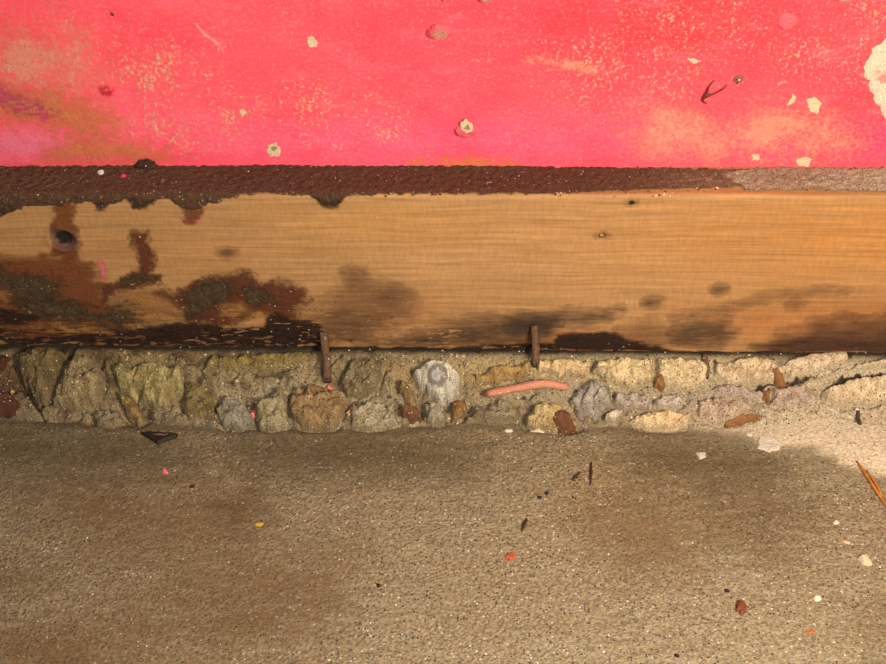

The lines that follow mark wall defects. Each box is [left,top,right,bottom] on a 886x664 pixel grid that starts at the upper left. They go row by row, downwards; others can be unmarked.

peeling [770,3,886,124]
water stain [0,315,323,347]
water stain [415,314,668,351]
water stain [757,321,886,353]
crack [755,373,886,392]
water stain [0,419,886,664]